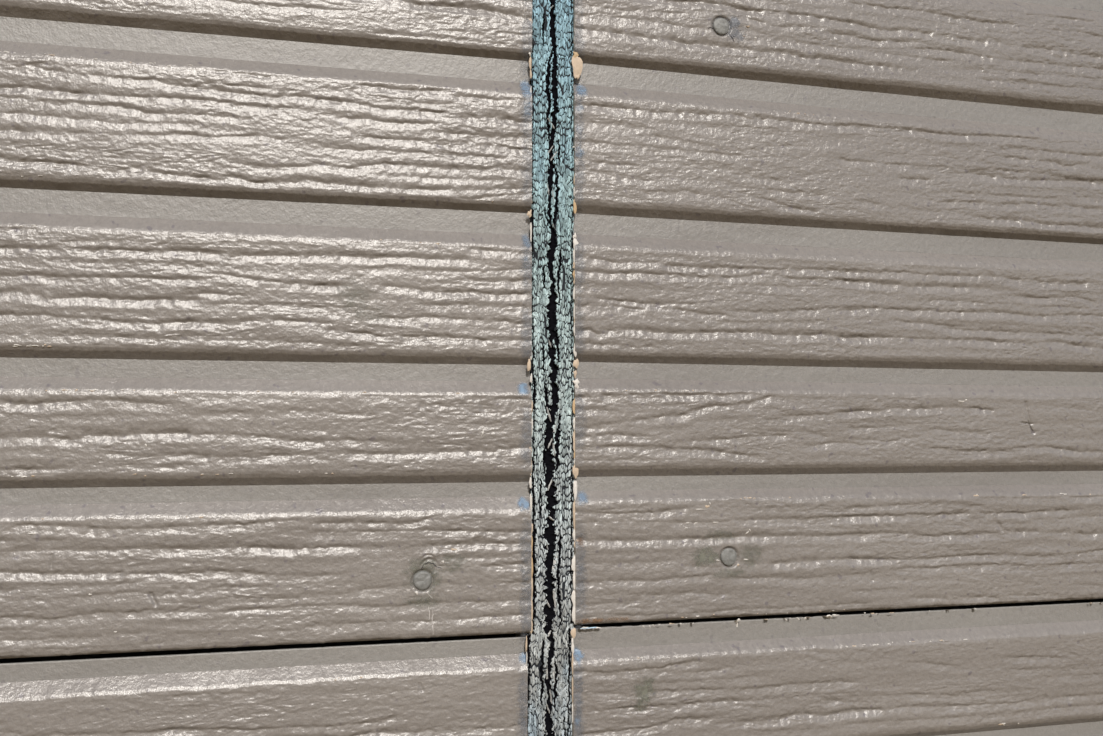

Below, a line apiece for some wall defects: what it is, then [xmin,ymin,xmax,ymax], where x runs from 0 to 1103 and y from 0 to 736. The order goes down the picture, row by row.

crack [526,0,573,736]